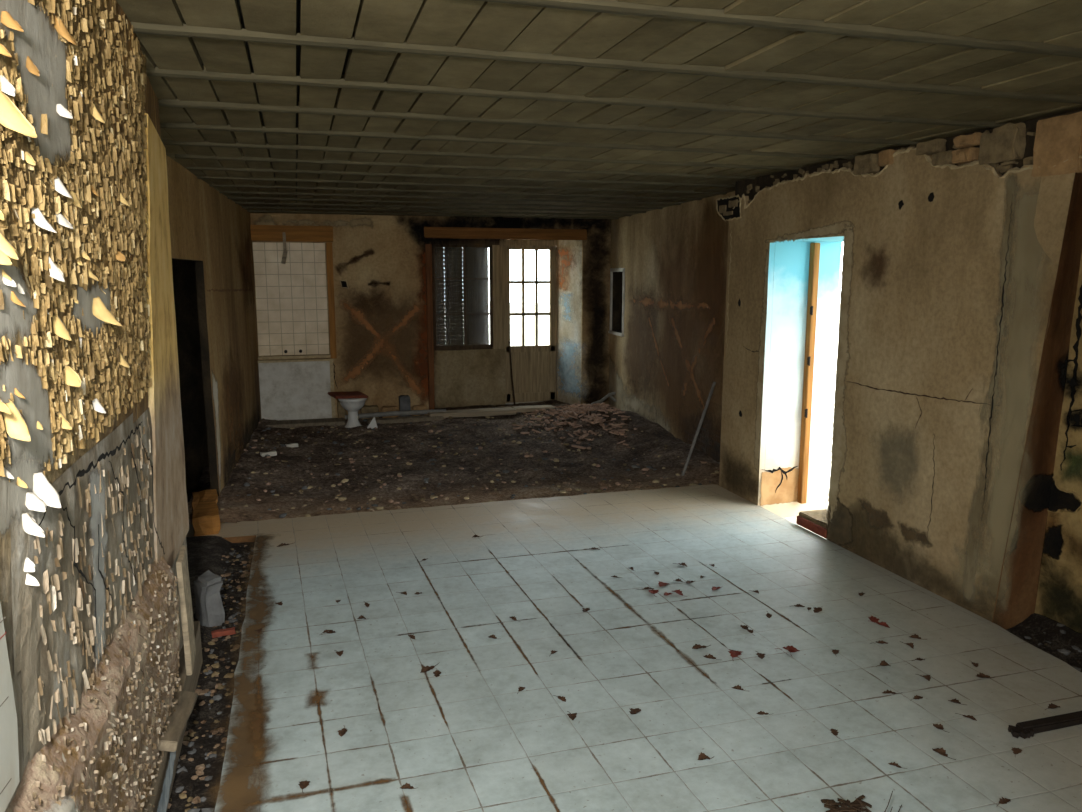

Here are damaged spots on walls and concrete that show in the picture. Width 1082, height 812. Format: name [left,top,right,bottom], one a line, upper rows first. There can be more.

flaking render [0,0,155,762]
corrosion [342,249,433,404]
water stain [869,250,885,280]
spalling [716,111,1082,601]
crack [844,380,1000,526]
water stain [1057,350,1082,398]
crack [1060,285,1082,471]
water stain [1065,410,1082,430]
water stain [831,509,994,622]
water stain [1039,560,1082,634]
water stain [213,535,392,812]
peeling [157,751,176,812]